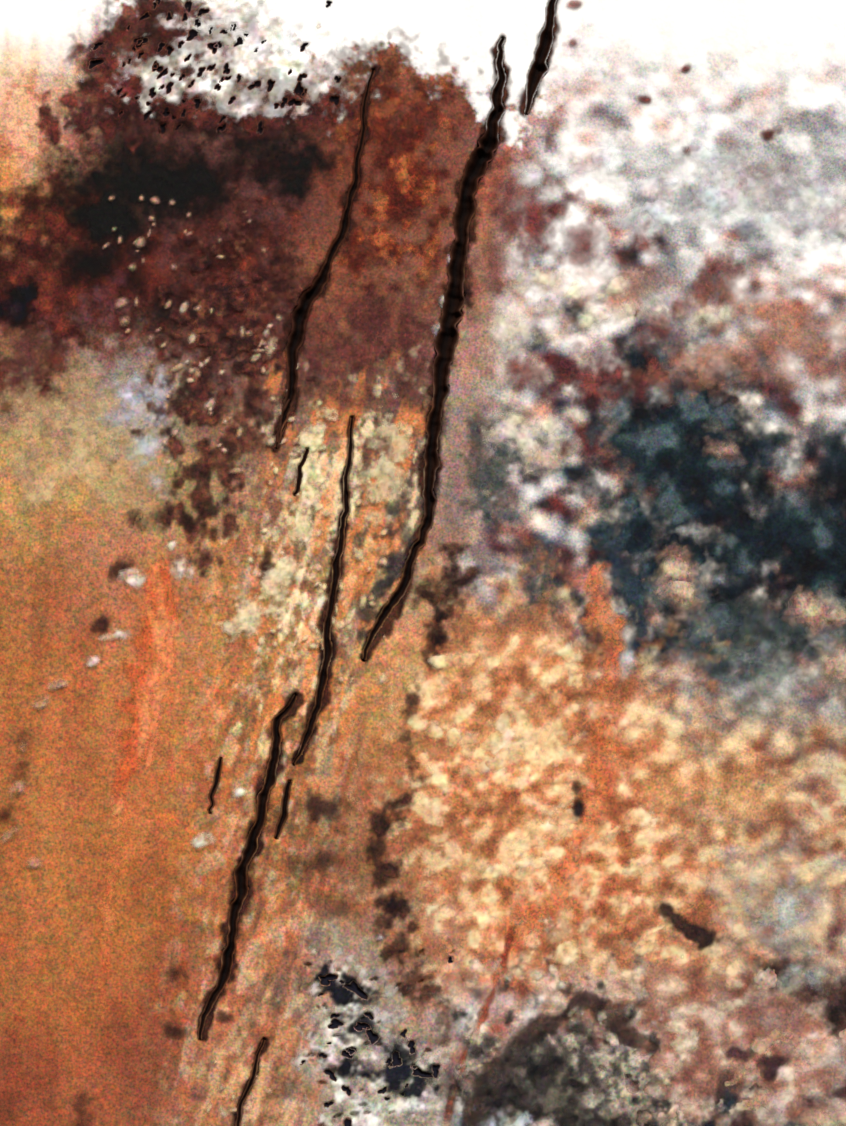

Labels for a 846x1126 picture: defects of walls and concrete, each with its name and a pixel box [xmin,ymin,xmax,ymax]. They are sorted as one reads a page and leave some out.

spalling [37,0,368,156]
rust [0,173,304,574]
rust [509,351,668,399]
crack [197,0,560,1040]
damp [470,413,560,522]
damp [562,339,846,700]
spalling [293,543,759,1126]
rust [443,564,624,1126]
crack [233,1036,269,1126]
damp [688,1047,788,1126]
spalling [635,992,846,1125]
damp [764,960,846,1034]